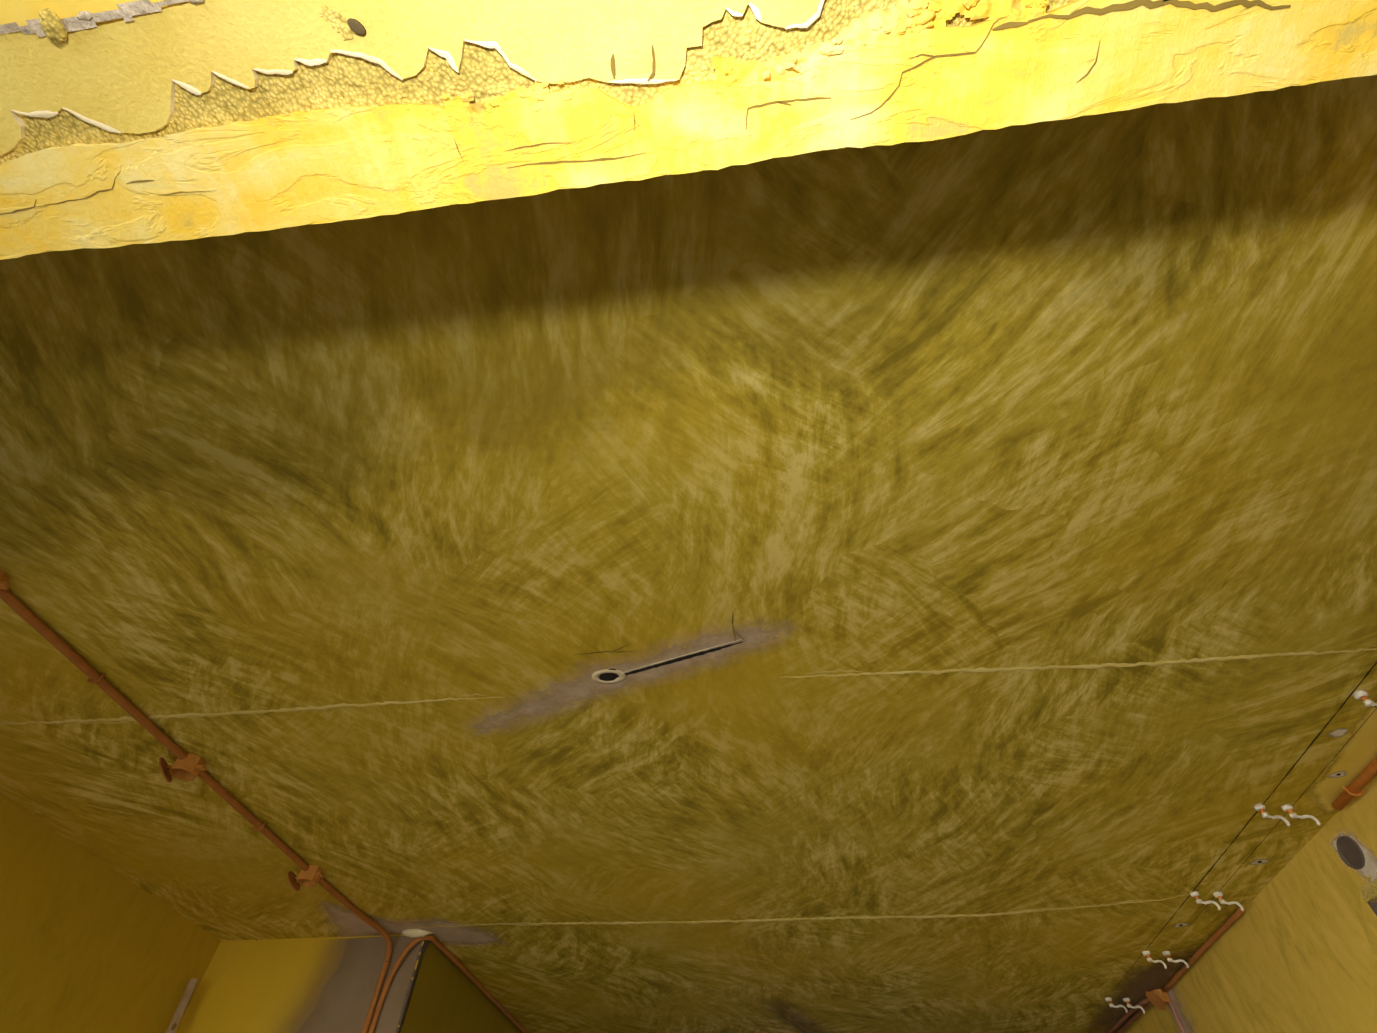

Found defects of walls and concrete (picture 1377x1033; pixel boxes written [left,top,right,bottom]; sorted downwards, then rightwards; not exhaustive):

crack [0,170,208,215]
peeling [0,0,1075,165]
crack [506,111,646,168]
crack [746,0,1291,130]